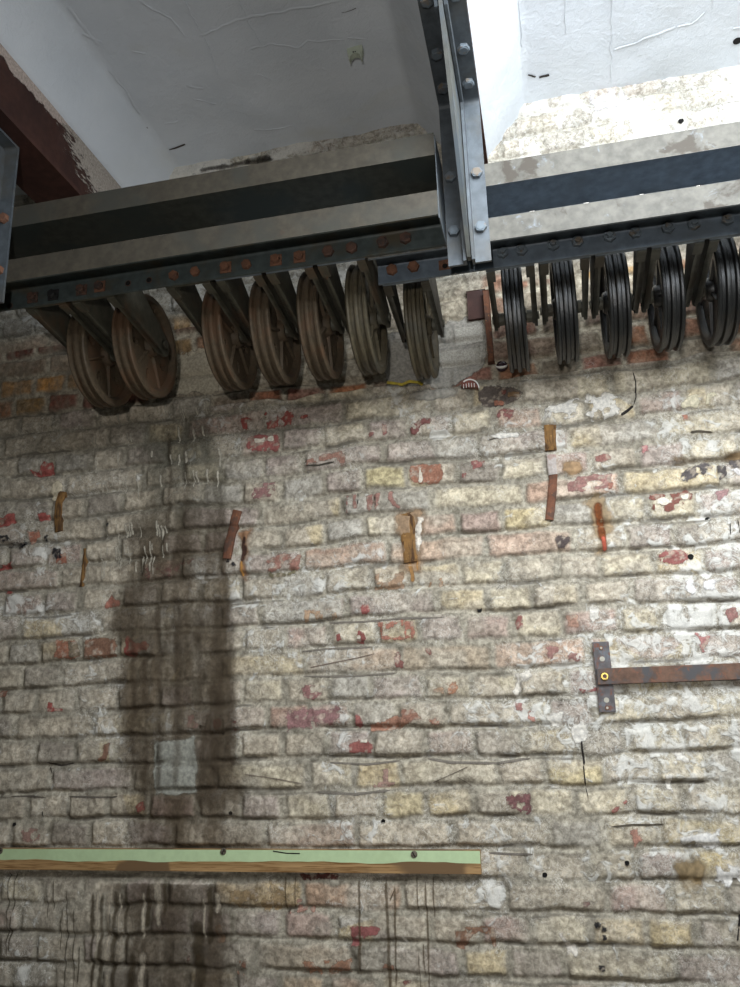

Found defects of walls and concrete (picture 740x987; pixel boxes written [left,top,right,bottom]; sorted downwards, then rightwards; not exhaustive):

peeling [240,411,308,452]
peeling [567,474,613,492]
peeling [595,454,611,463]
corrosion [724,451,740,462]
leakage [88,521,168,578]
corrosion [585,492,613,554]
leakage [91,892,145,987]
leakage [141,882,170,937]
leakage [195,889,221,975]